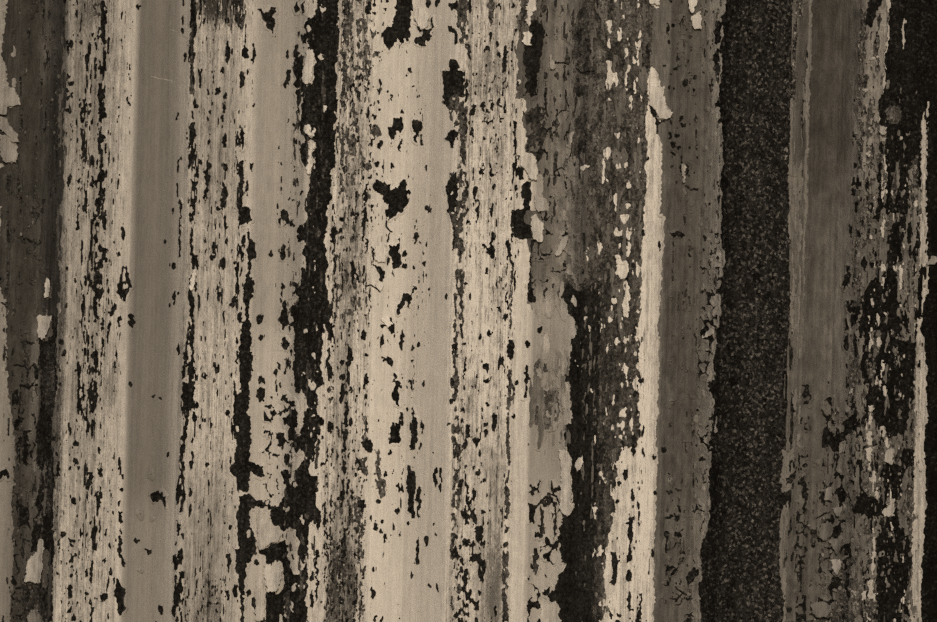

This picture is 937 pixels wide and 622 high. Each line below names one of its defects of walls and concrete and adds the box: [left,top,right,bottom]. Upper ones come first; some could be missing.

peeling [414,7,429,29]
peeling [298,49,315,95]
peeling [305,124,316,174]
peeling [512,0,610,324]
peeling [365,244,388,262]
peeling [609,209,646,274]
peeling [0,0,68,622]
peeling [636,0,726,622]
peeling [782,0,937,622]
peeling [256,508,281,555]
peeling [254,563,282,621]
peeling [540,591,562,622]